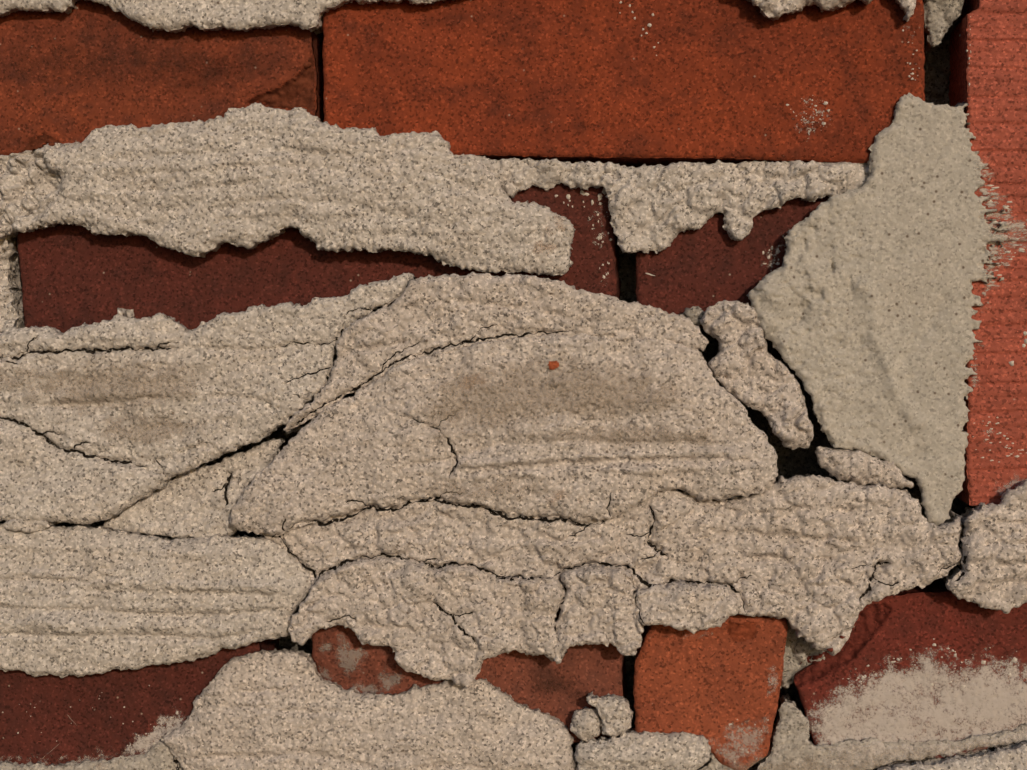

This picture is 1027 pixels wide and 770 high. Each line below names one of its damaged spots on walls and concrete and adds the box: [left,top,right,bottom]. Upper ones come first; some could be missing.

spalling [250,57,316,110]
spalling [21,134,60,153]
crack [0,337,179,364]
crack [281,277,573,443]
crack [0,417,166,477]
crack [212,472,232,505]
crack [272,410,755,633]
crack [939,511,967,582]
crack [852,562,899,601]
crack [433,602,478,647]
spalling [795,606,889,684]
efflorescence [808,638,1027,767]